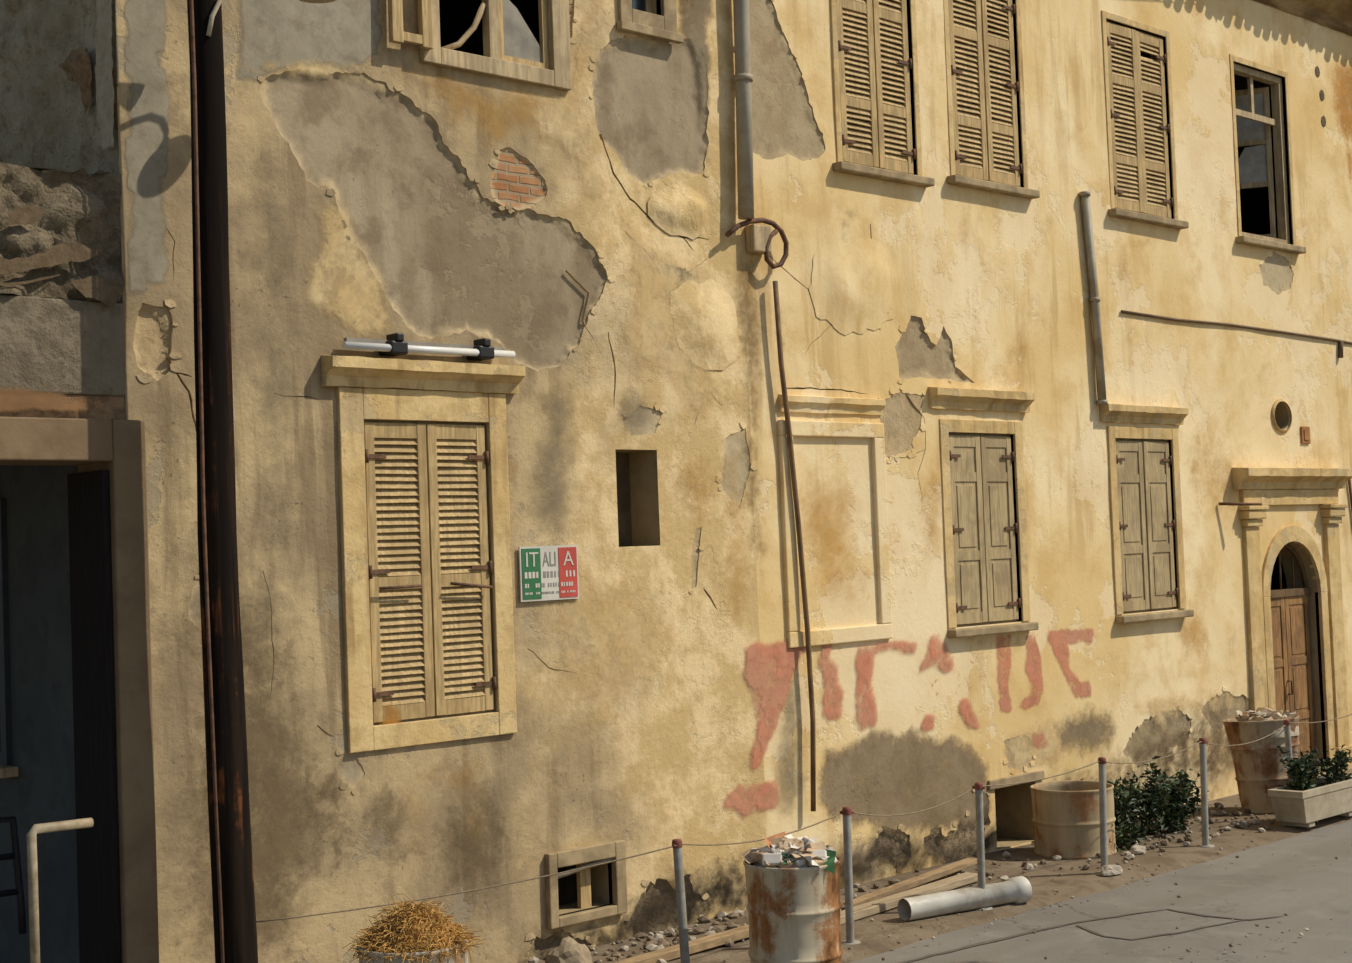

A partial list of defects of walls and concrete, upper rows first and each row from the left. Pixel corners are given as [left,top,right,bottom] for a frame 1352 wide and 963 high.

peeling [59,0,114,149]
spalling [533,0,710,194]
spalling [749,0,825,161]
peeling [0,242,123,307]
spalling [257,63,616,371]
crack [601,138,707,275]
spalling [878,316,974,464]
damp [838,829,994,889]